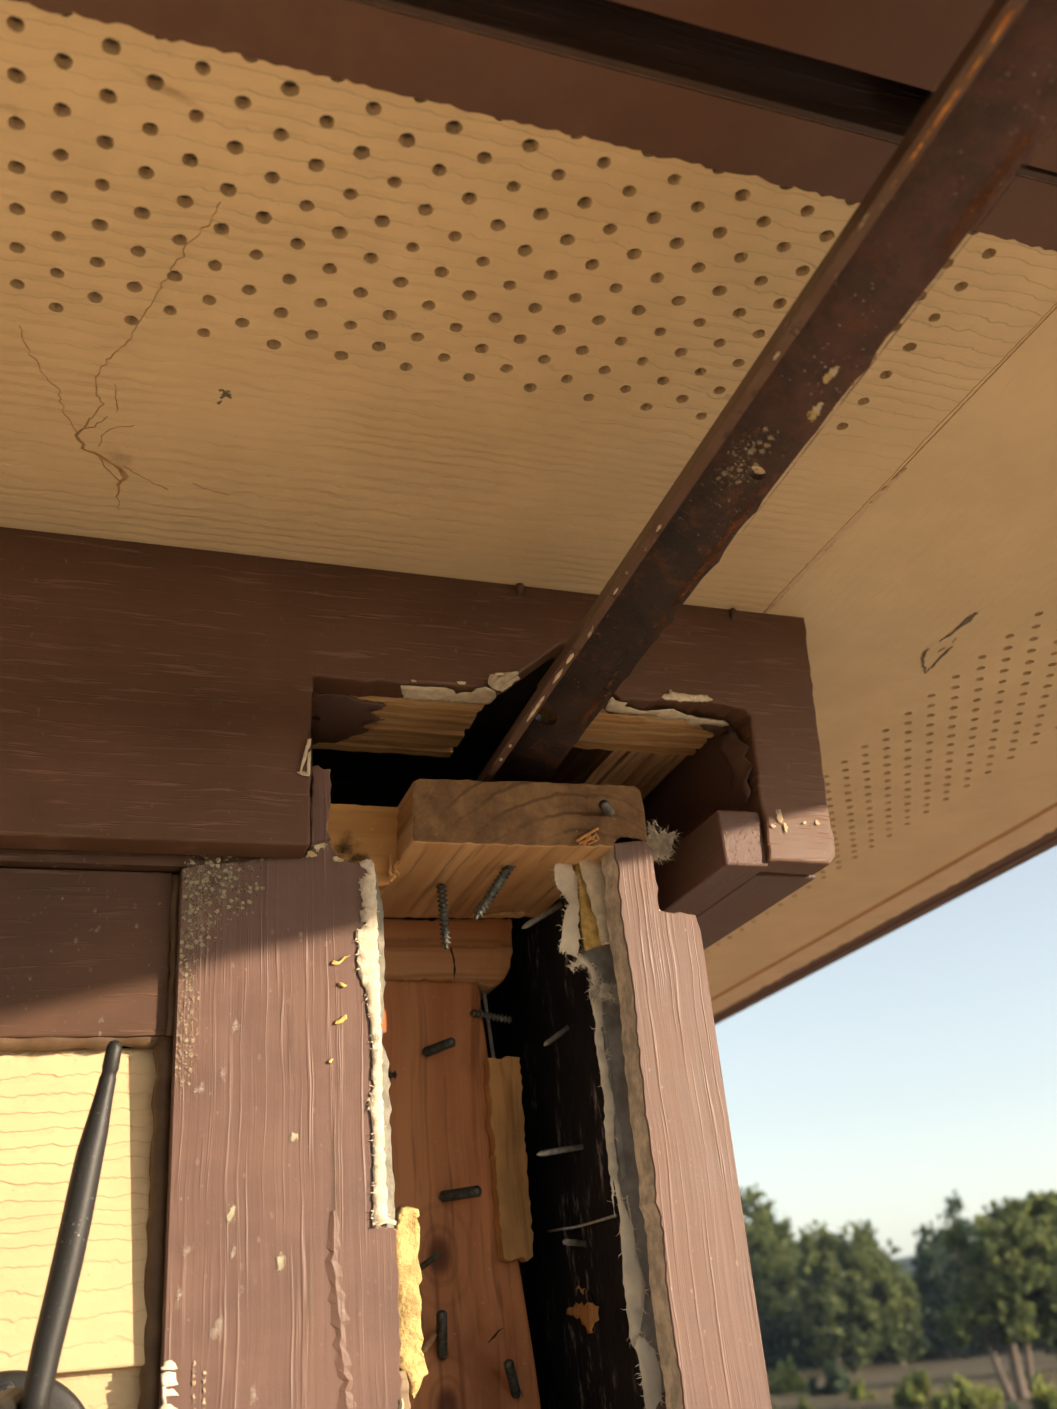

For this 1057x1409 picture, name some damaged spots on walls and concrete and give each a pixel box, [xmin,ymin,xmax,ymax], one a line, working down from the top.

corrosion [890,8,1014,189]
crack [19,202,228,508]
peeling [401,671,520,704]
peeling [527,653,574,722]
peeling [605,689,729,727]
peeling [331,859,396,1227]